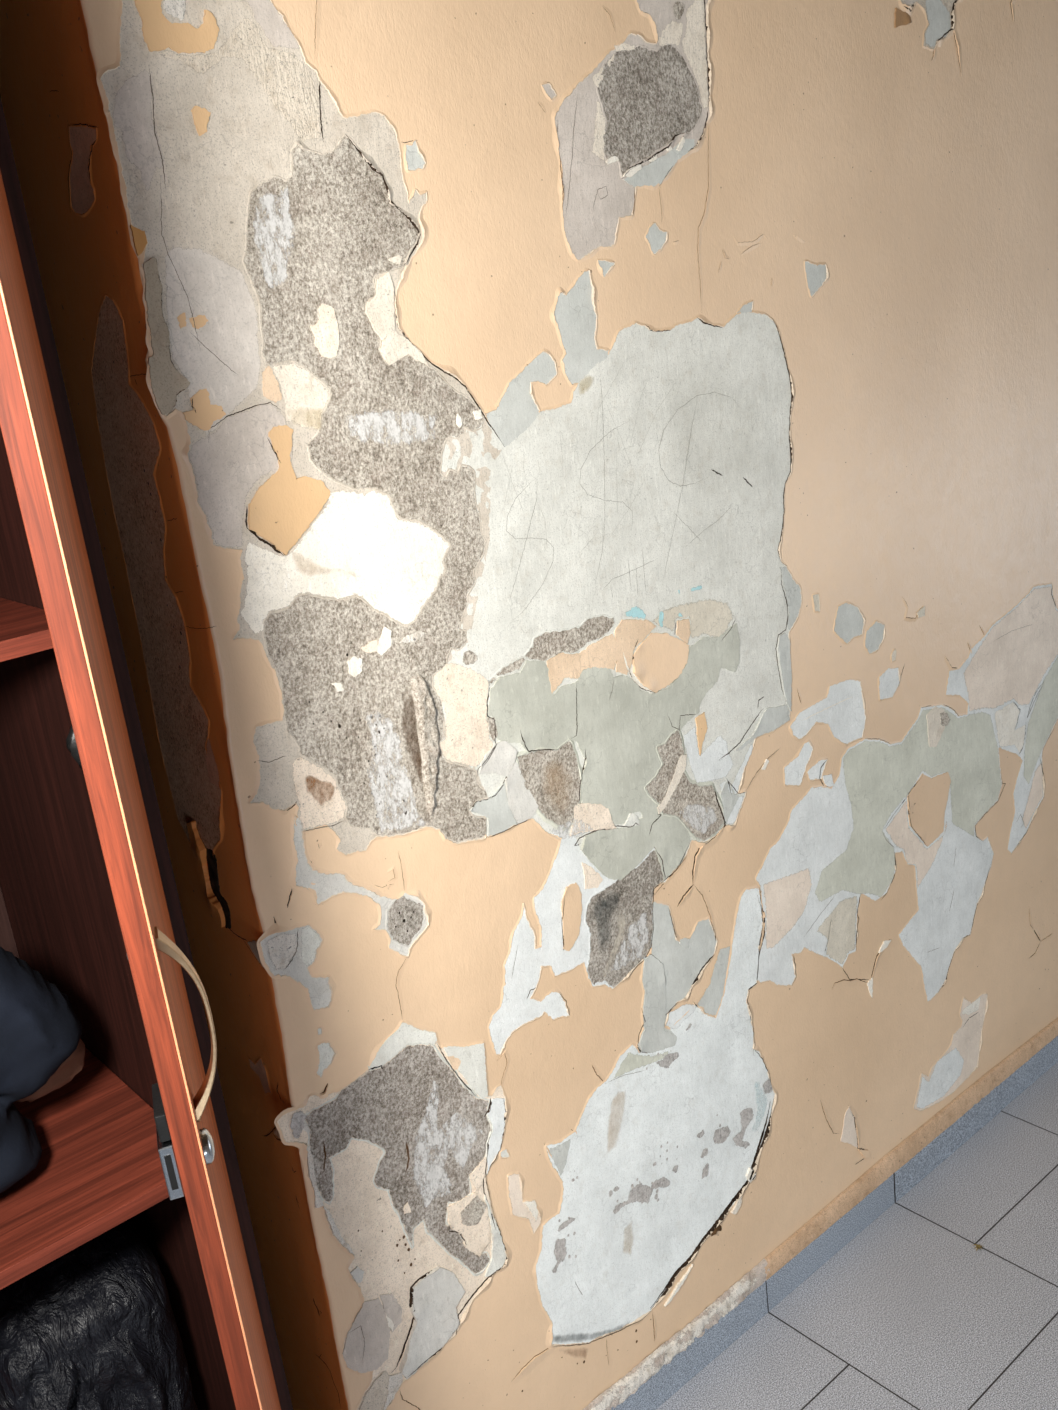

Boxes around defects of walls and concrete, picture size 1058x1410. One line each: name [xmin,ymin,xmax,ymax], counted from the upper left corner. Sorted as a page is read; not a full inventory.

peeling [67,119,98,218]
peeling [541,0,715,278]
peeling [803,259,830,299]
peeling [894,0,964,76]
peeling [91,0,558,960]
peeling [433,268,1058,1349]
peeling [257,914,336,1012]
peeling [274,1019,512,1410]